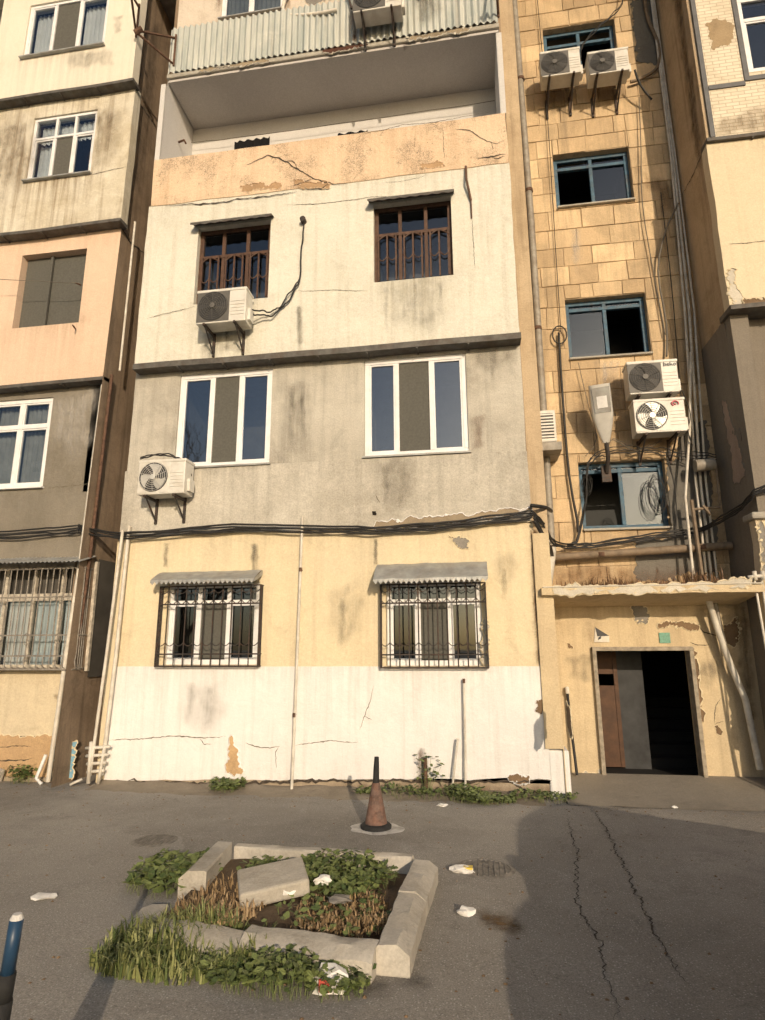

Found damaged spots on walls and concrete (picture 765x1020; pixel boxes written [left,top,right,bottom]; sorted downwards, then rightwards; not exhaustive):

peeling [705,18,735,50]
crack [358,112,503,161]
crack [165,155,423,206]
peeling [725,267,765,304]
peeling [373,507,533,530]
peeling [552,519,765,632]
spalling [722,616,742,648]
spalling [0,733,58,777]
peeling [69,740,78,780]
peeling [224,734,245,777]
crack [567,817,621,1018]
crack [595,812,689,984]